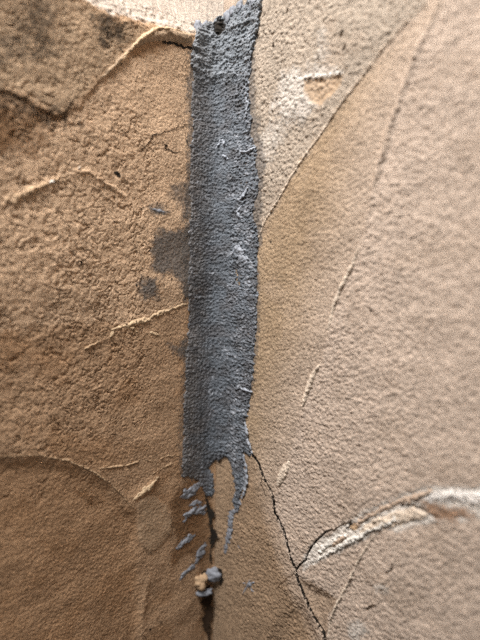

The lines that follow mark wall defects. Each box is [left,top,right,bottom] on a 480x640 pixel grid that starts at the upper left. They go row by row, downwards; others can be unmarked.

crack [205,495,224,586]
crack [252,454,326,640]
spalling [303,486,480,571]